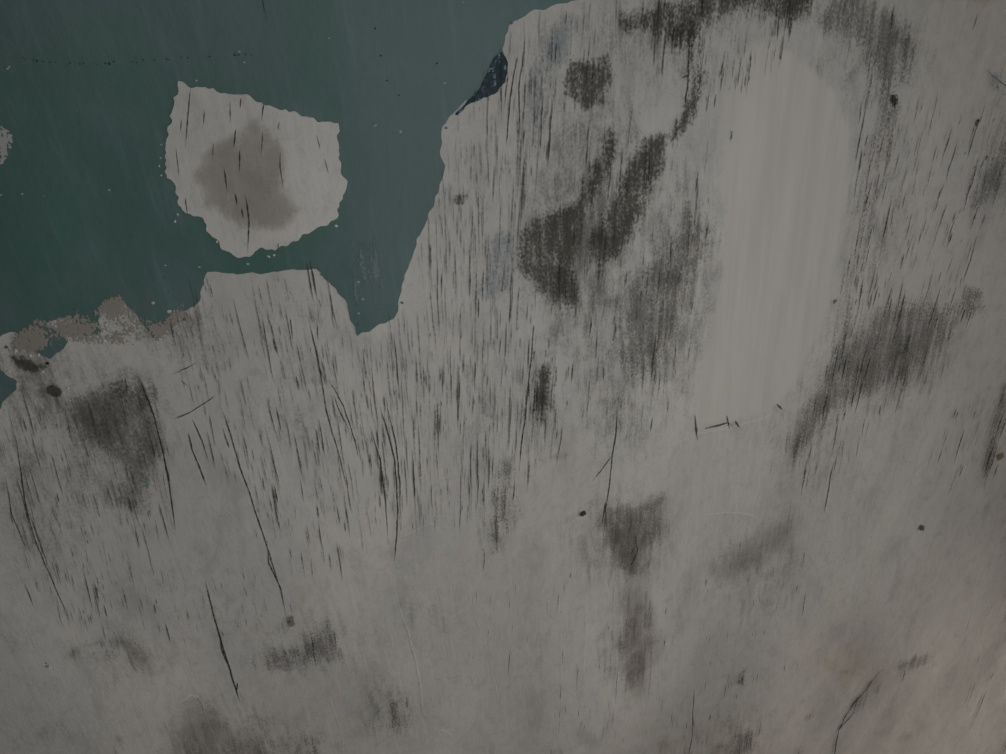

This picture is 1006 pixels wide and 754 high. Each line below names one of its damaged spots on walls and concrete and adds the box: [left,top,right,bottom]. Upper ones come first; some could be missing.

peeling [0,0,574,409]
damp [518,0,812,309]
damp [824,0,914,113]
damp [793,289,980,463]